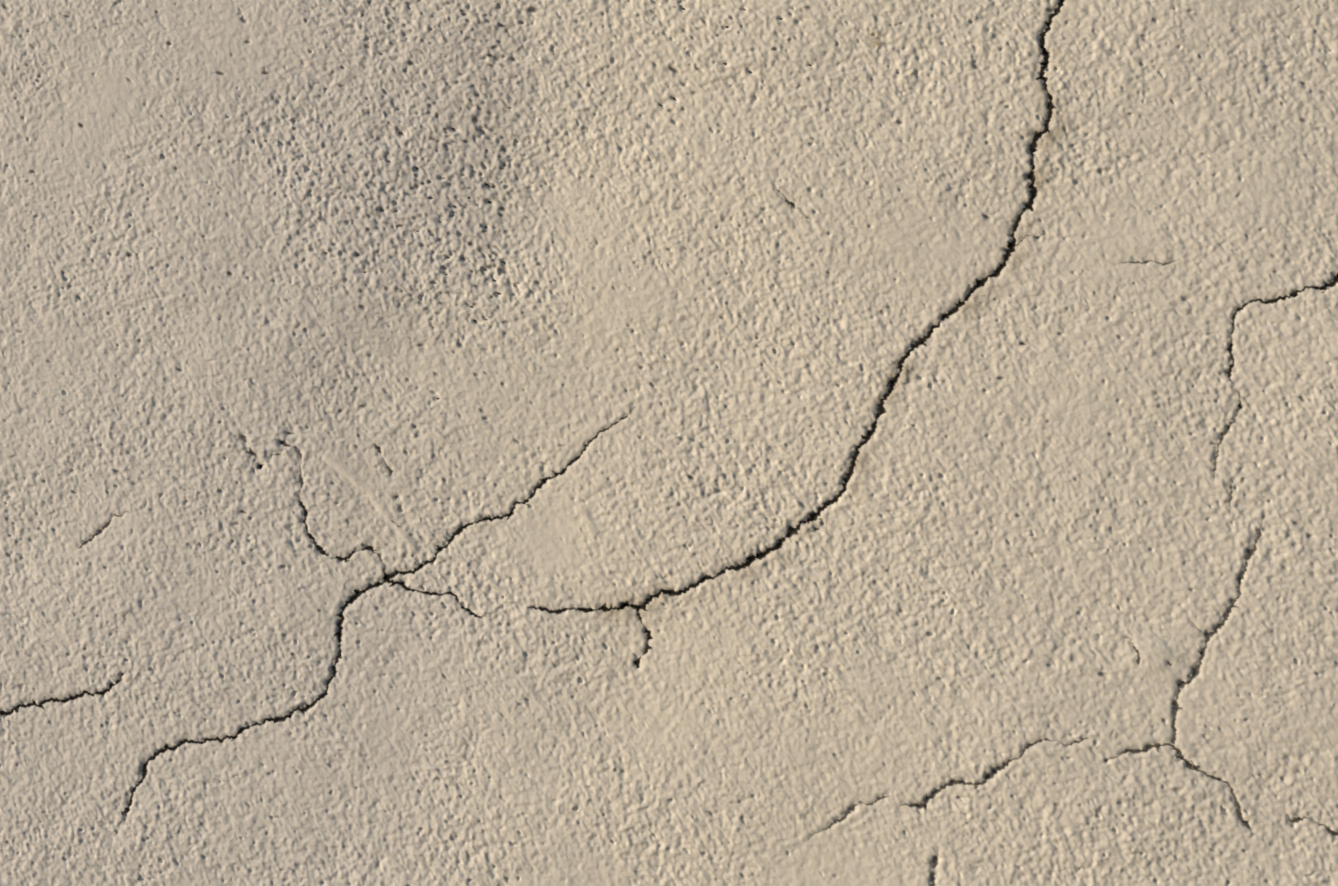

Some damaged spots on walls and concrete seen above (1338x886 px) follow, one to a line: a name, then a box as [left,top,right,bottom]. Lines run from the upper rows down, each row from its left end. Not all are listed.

crack [532,0,1064,668]
crack [1213,273,1338,503]
crack [0,673,124,716]
crack [121,416,627,817]
crack [826,529,1261,829]
crack [930,856,938,886]
crack [1289,817,1338,835]